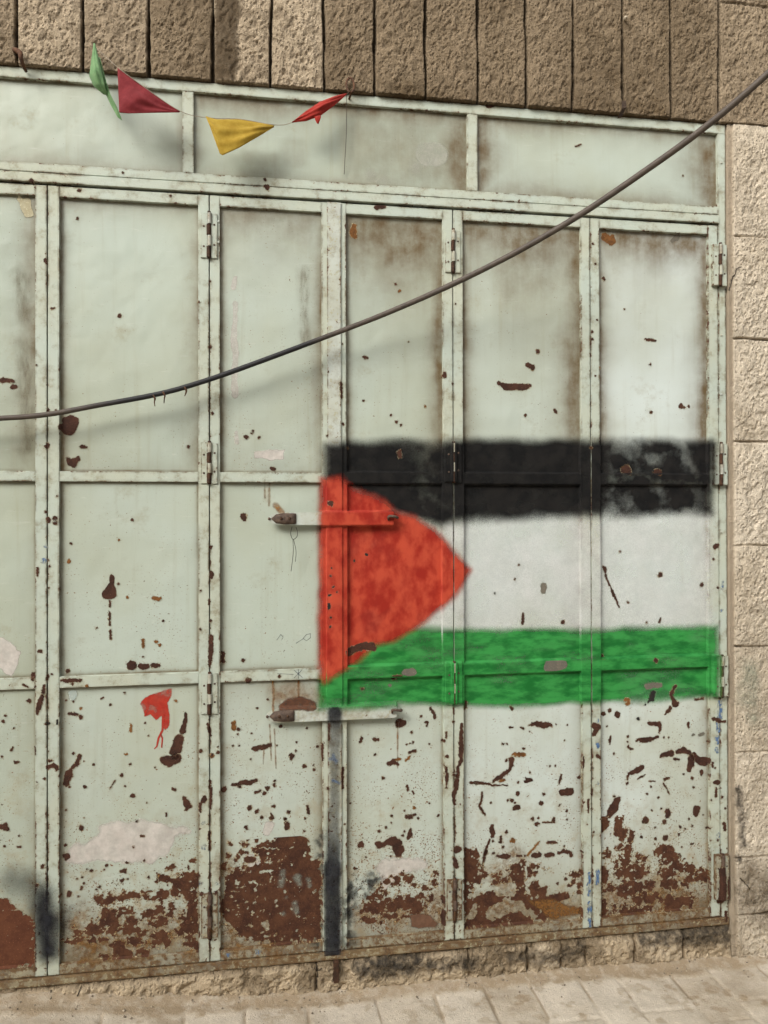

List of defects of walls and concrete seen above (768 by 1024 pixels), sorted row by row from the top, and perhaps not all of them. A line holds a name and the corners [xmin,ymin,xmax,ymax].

peeling [0,637,21,676]
peeling [59,778,323,961]
rust [394,902,442,928]
rust [529,899,581,919]